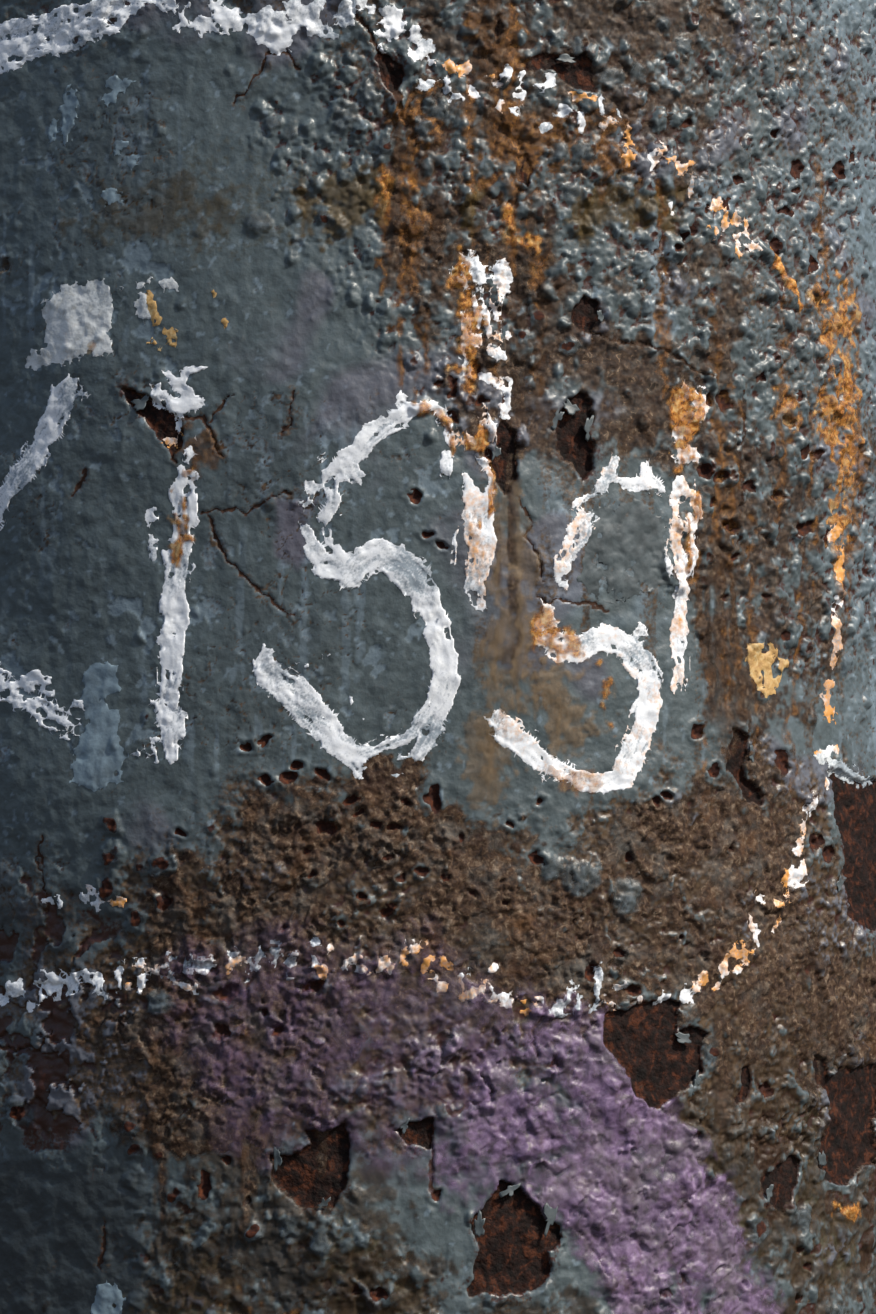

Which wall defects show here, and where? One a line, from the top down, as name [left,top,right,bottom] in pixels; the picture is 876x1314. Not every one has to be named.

rust [370,0,867,746]
rust [169,498,194,566]
crack [201,490,295,616]
spalling [809,748,876,933]
rust [76,750,876,1237]
spalling [603,985,708,1109]
spalling [270,1123,350,1210]
spalling [813,1056,876,1185]
spalling [467,1180,561,1296]